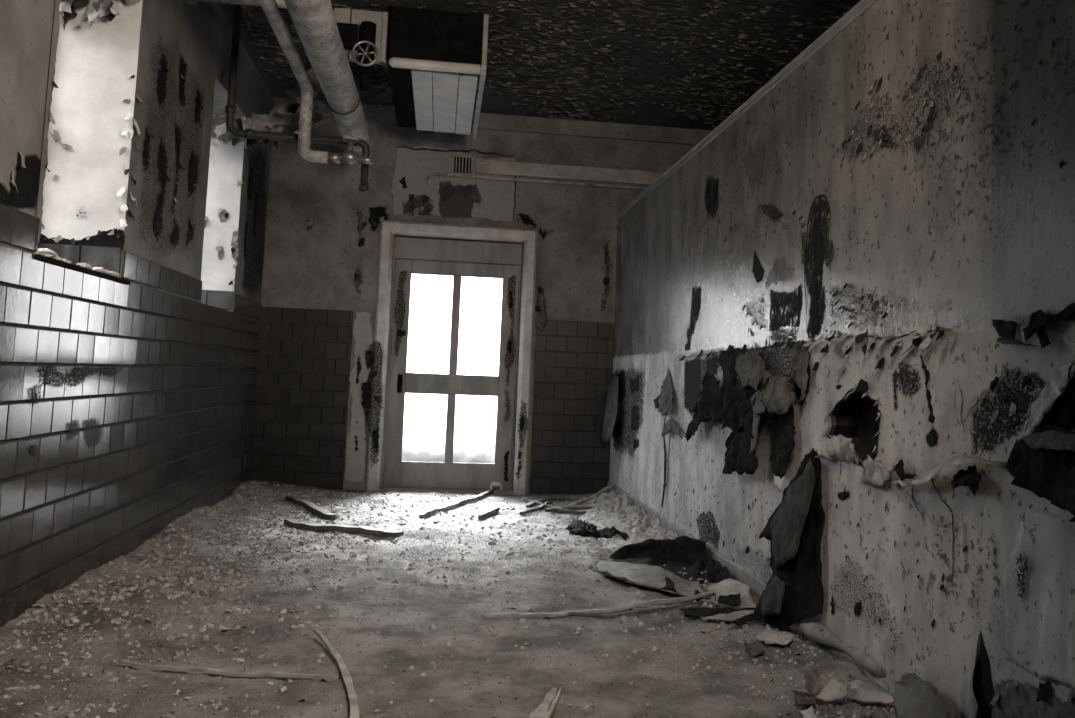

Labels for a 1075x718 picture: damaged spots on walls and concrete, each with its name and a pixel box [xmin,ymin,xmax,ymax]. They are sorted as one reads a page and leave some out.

peeling [0,0,140,243]
peeling [71,38,243,258]
peeling [244,148,267,294]
flaking render [356,146,554,247]
peeling [445,0,858,131]
damp [769,194,834,351]
flaking render [345,312,374,483]
flaking render [683,353,720,416]
flaking render [758,339,811,406]
spalling [821,378,881,467]
mould [955,364,1045,454]
flaking render [990,679,1075,718]